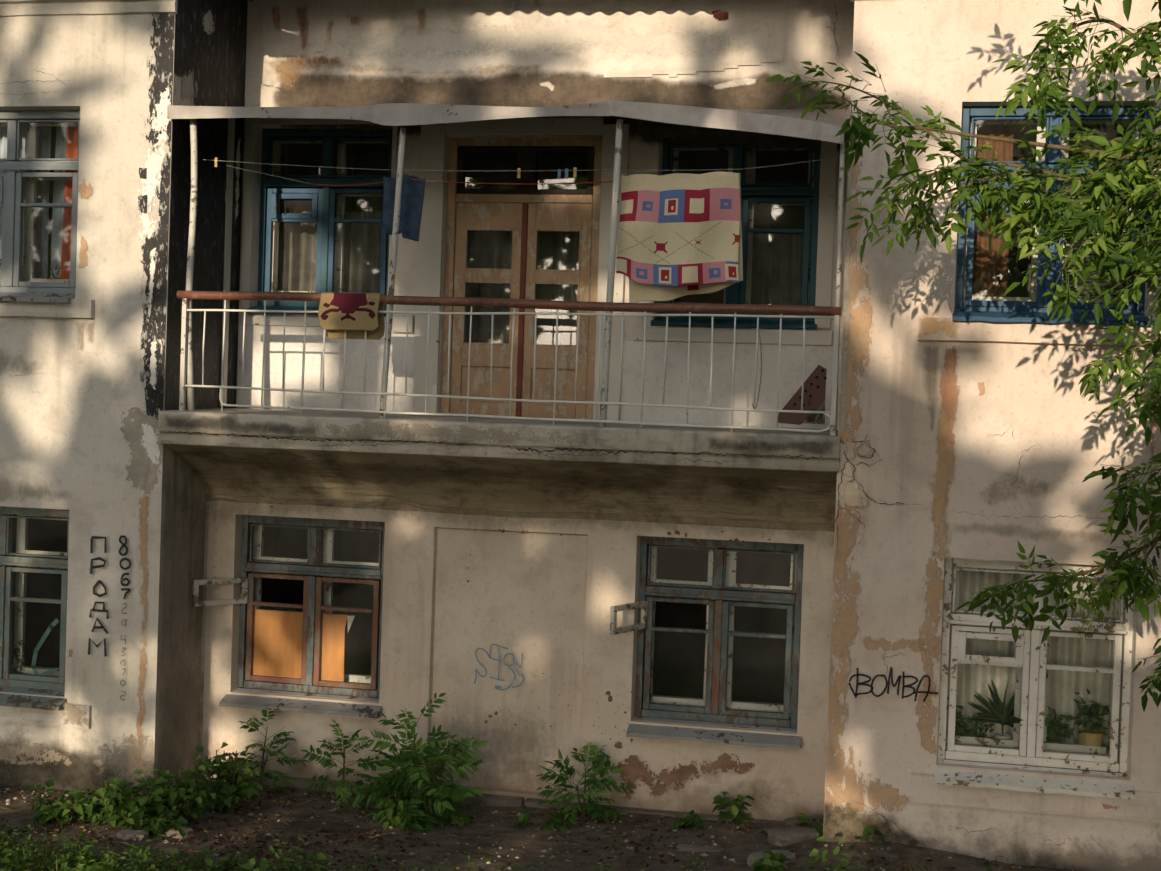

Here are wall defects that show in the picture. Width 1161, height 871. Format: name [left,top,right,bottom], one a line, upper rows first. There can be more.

leakage [275,61,850,151]
peeling [121,0,248,494]
crack [163,430,923,556]
crack [954,425,1105,519]
rust [140,497,149,631]
leakage [0,742,151,795]
rust [136,648,147,761]
peeling [593,691,755,801]
peeling [824,504,944,847]